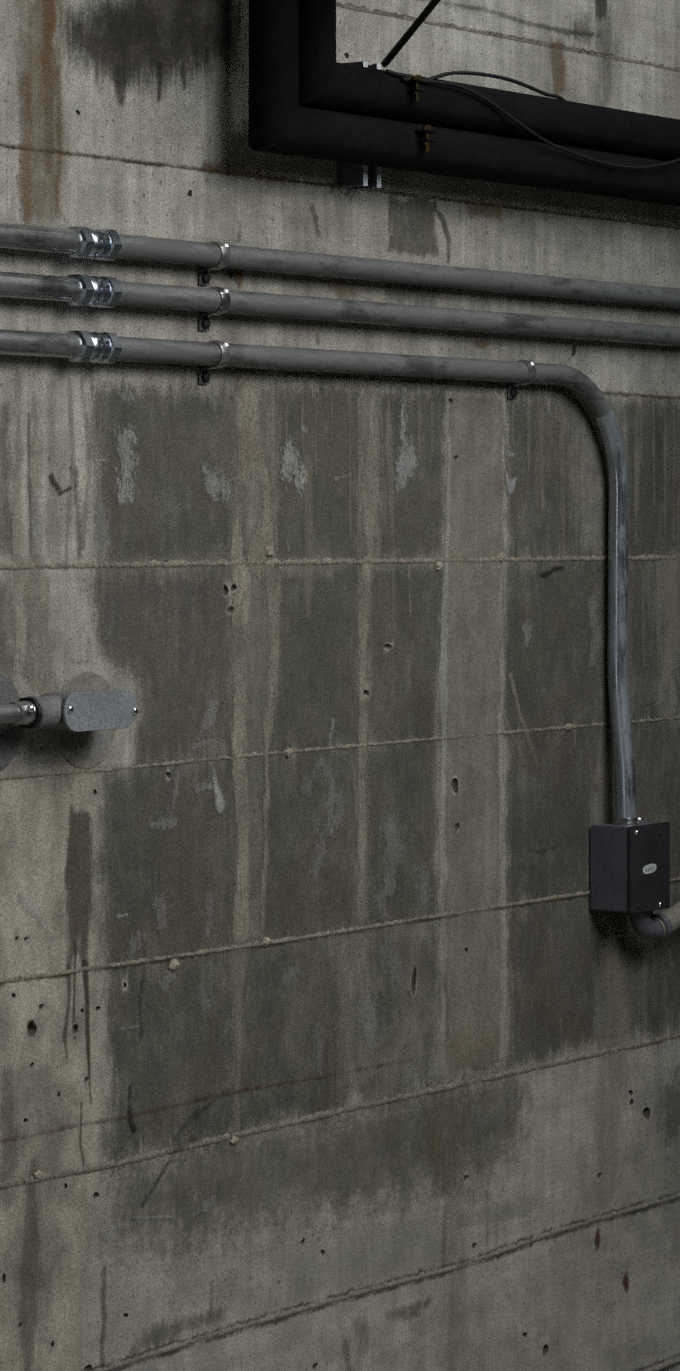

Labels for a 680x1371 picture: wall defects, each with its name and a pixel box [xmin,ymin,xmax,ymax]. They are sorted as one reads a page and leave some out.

water stain [0,369,680,1371]